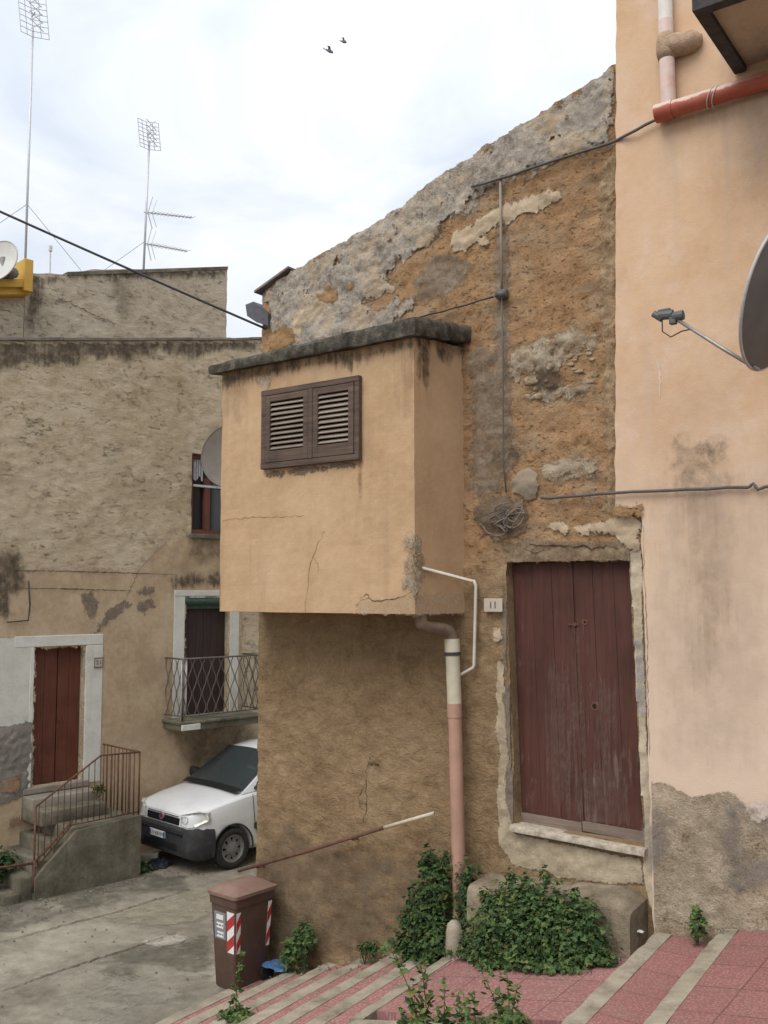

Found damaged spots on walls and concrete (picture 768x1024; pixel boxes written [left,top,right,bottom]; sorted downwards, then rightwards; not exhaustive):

flaking render [263,67,615,351]
water stain [0,341,255,367]
water stain [224,351,361,392]
spalling [507,326,601,404]
flaking render [547,504,644,551]
spalling [402,534,425,600]
flaking render [492,627,503,642]
flaking render [0,721,34,805]
flaking render [495,660,768,943]